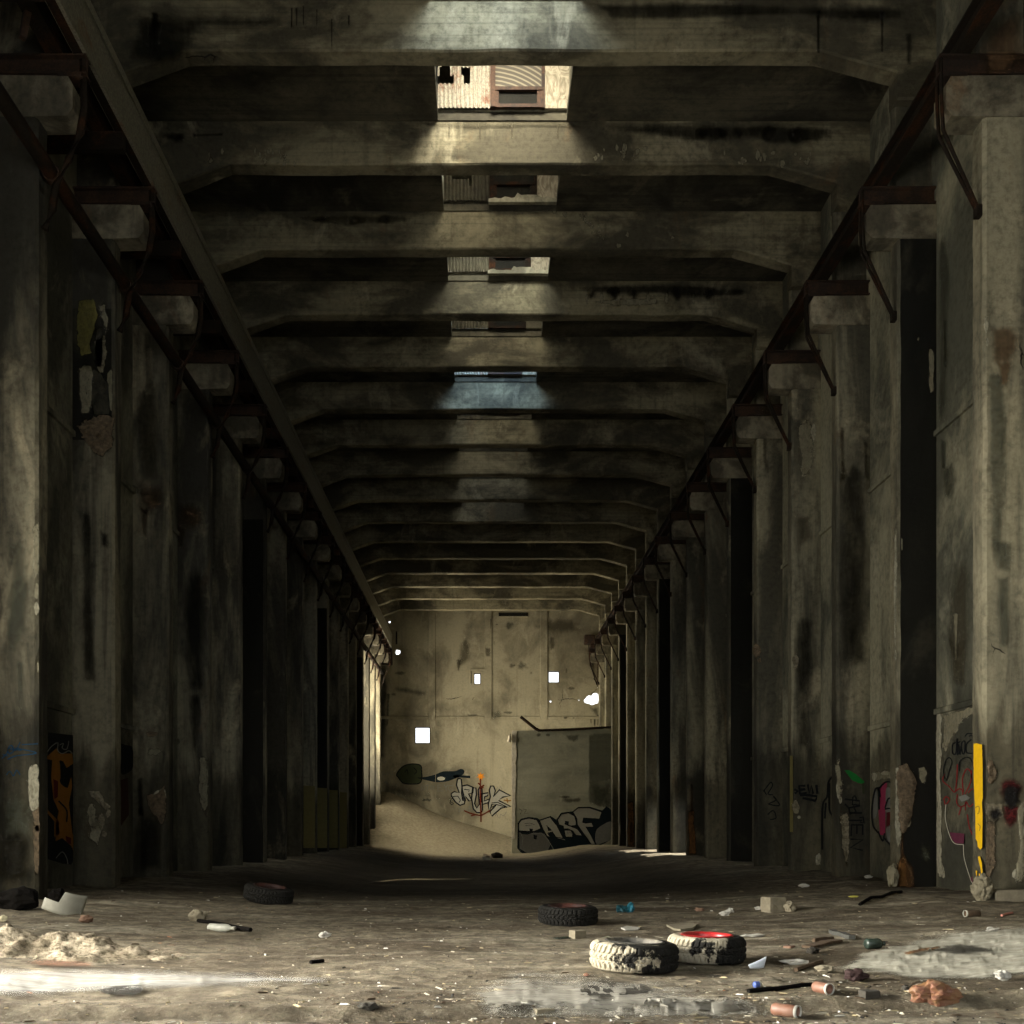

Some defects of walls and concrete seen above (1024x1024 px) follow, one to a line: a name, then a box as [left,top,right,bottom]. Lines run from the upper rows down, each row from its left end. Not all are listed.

spalling [76,299,112,415]
spalling [28,764,40,874]
spalling [87,790,111,844]
peeling [835,761,850,863]
spalling [872,707,973,878]